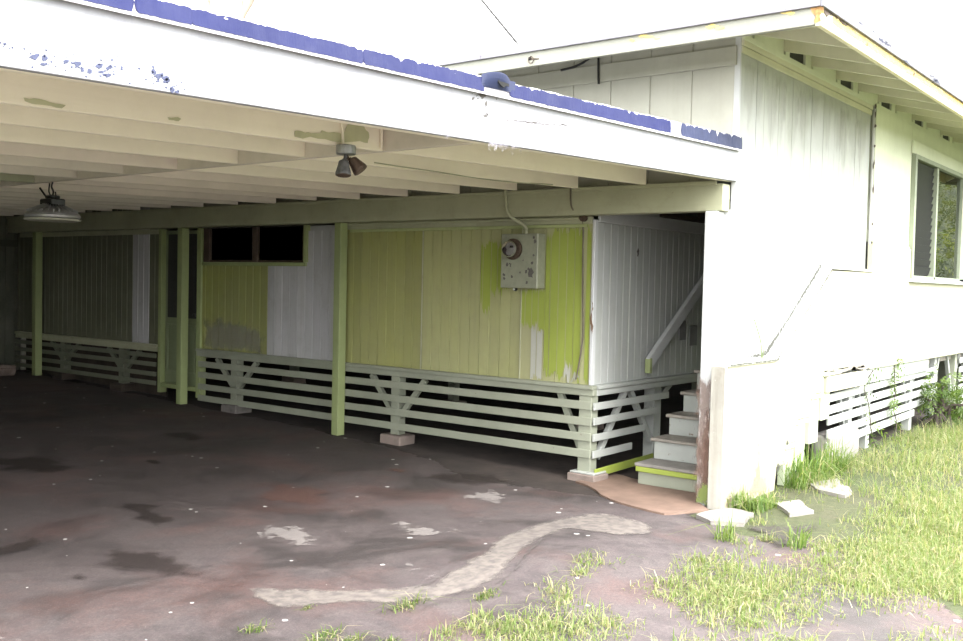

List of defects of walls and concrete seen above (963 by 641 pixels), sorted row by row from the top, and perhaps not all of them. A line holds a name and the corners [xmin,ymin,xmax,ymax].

peeling [810,6,824,23]
peeling [0,42,123,82]
peeling [84,0,503,123]
peeling [24,98,66,108]
crack [504,118,570,128]
peeling [295,124,369,143]